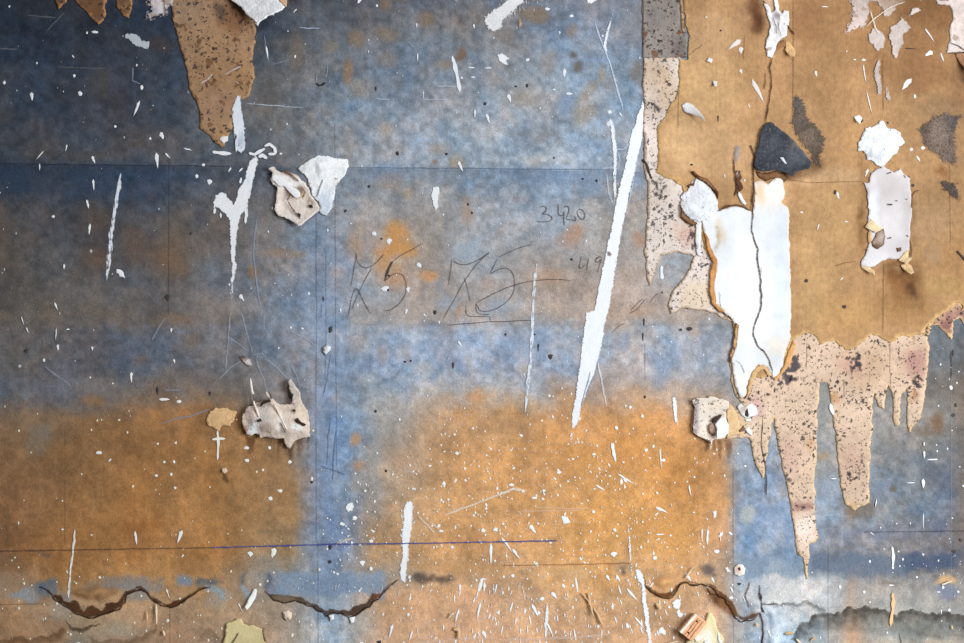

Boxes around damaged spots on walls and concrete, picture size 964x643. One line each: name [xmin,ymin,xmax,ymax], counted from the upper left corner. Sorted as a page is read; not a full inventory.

peeling [785,41,796,57]
crack [764,59,772,122]
peeling [688,171,719,198]
peeling [865,219,882,242]
crack [733,145,773,376]
peeling [899,250,914,274]
spalling [737,403,757,436]
crack [39,586,209,619]
crack [266,579,399,618]
crack [643,577,775,643]
leakage [794,603,964,639]